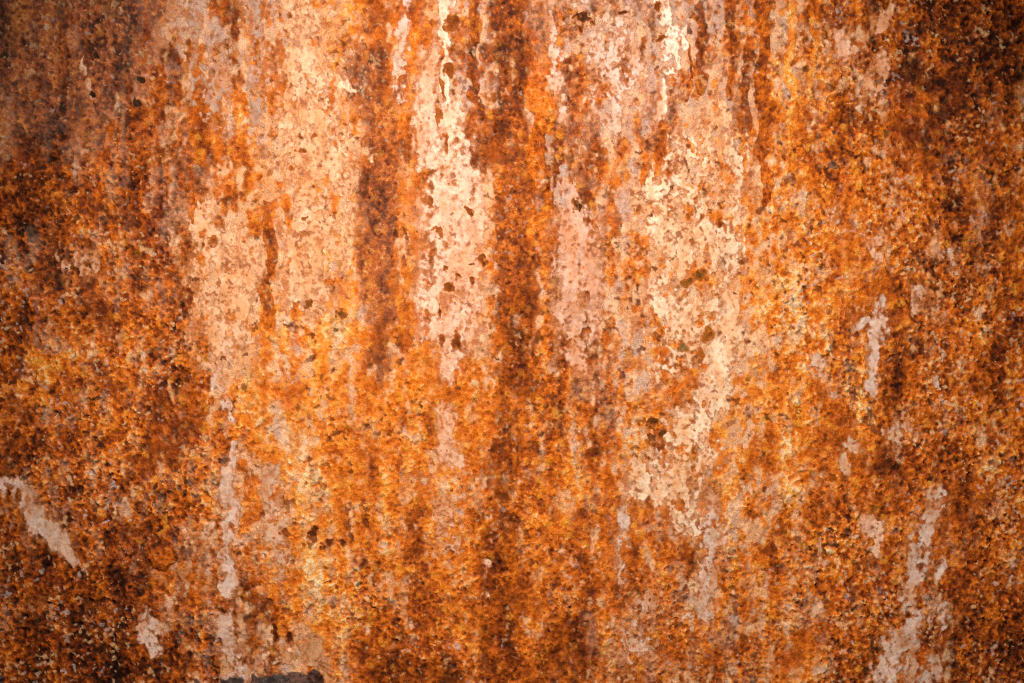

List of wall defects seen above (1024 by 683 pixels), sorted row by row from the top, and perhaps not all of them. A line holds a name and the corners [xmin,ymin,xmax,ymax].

rust [685,1,713,102]
rust [189,65,212,167]
rust [232,99,247,151]
rust [724,0,820,206]
rust [257,201,278,332]
rust [339,30,453,443]
rust [15,344,73,406]
rust [180,352,210,436]
rust [246,352,305,452]
rust [463,0,555,683]
rust [146,540,178,571]